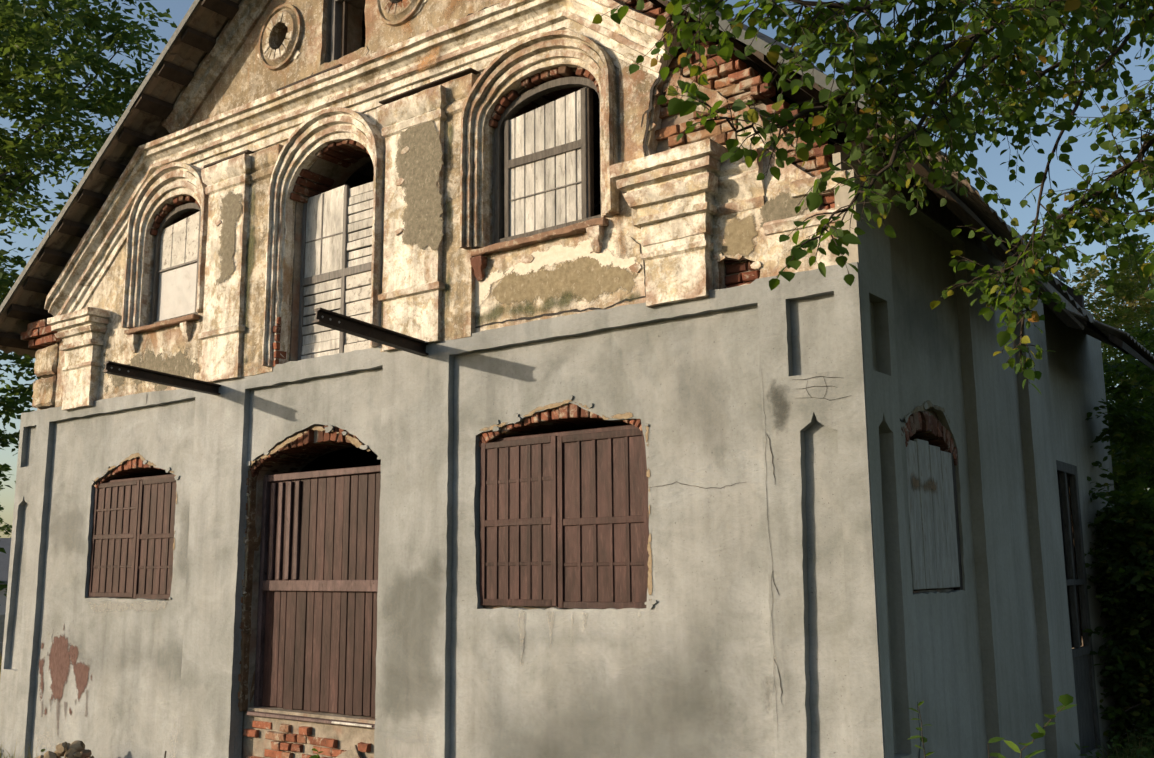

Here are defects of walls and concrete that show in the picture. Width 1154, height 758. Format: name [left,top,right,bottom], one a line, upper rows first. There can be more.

flaking render [615,0,835,177]
flaking render [394,109,444,250]
flaking render [475,239,642,308]
flaking render [713,191,839,288]
flaking render [91,453,180,504]
flaking render [246,424,381,466]
flaking render [479,395,633,432]
leakage [771,389,787,423]
crack [797,376,848,400]
flaking render [645,534,657,609]
crack [649,381,782,719]